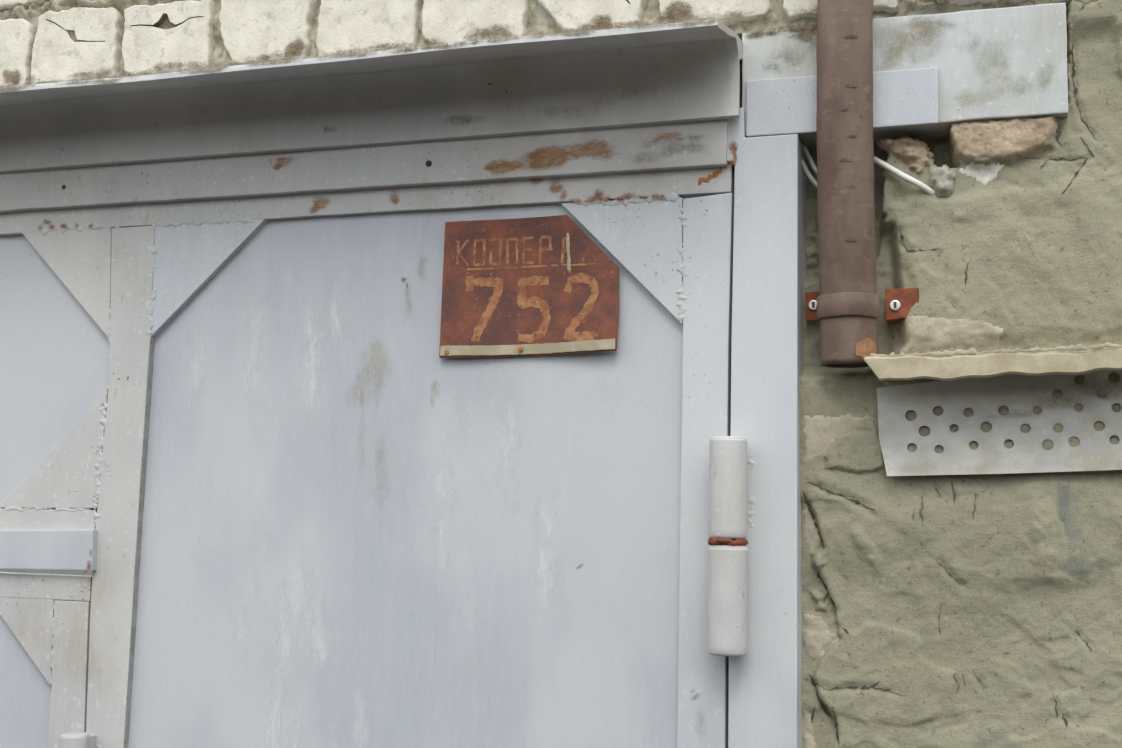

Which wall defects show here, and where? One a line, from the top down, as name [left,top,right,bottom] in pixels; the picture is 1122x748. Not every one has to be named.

crack [46,19,106,42]
crack [130,13,203,30]
crack [1020,45,1099,194]
rust [486,142,664,202]
spalling [876,136,934,174]
crack [803,482,876,634]
crack [808,673,903,746]